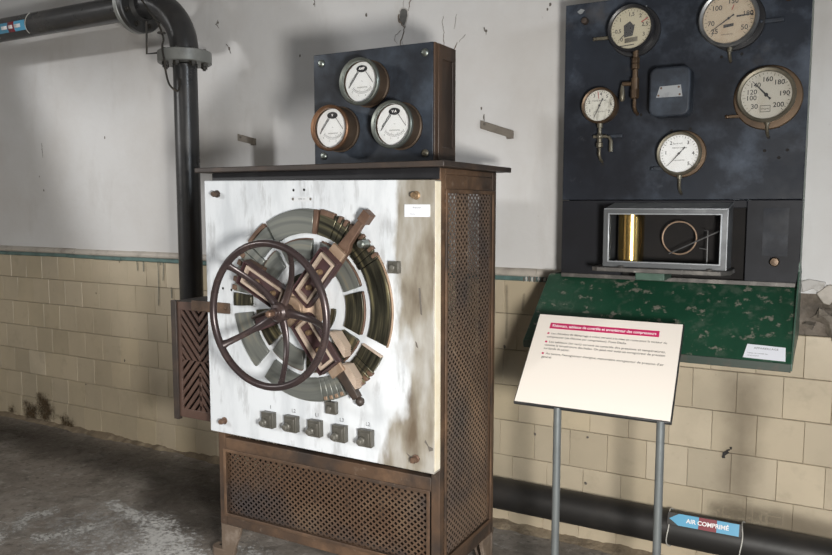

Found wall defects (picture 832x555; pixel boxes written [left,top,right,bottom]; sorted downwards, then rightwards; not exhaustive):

spalling [801,279,832,341]
damp [25,393,74,427]
damp [0,500,206,555]